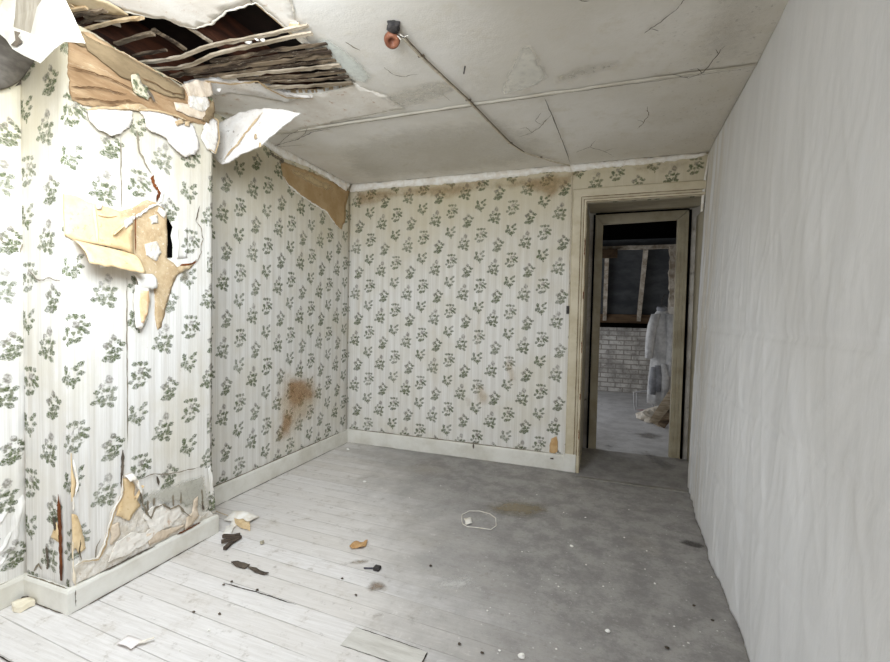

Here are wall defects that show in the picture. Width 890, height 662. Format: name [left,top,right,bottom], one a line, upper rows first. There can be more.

peeling [86,76,220,157]
spalling [270,83,346,93]
crack [275,45,745,159]
spalling [71,453,213,604]